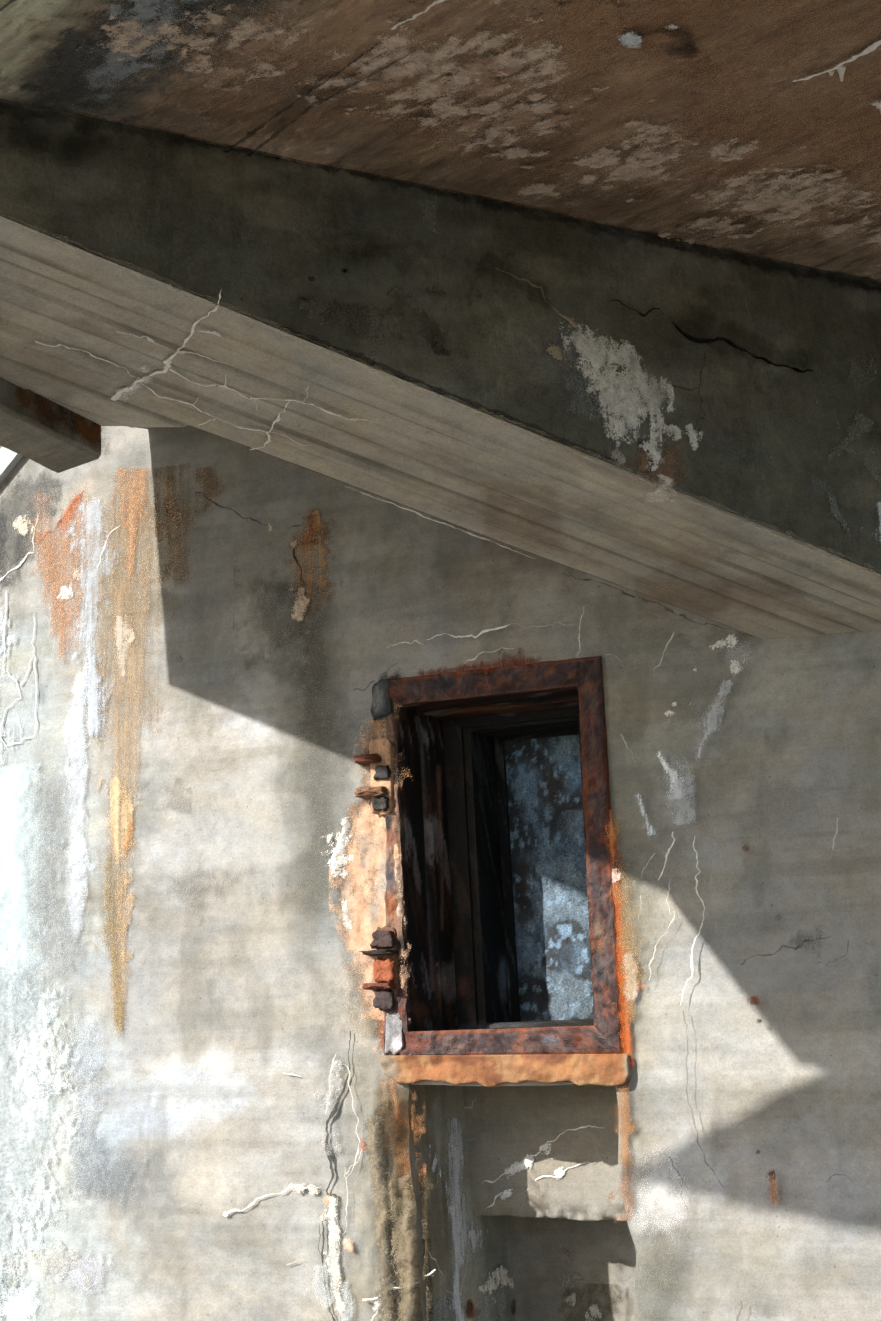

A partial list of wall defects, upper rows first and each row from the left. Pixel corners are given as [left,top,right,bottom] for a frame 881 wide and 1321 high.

leakage [28,0,259,111]
rust [16,388,107,447]
crack [35,289,384,450]
peeling [628,442,686,489]
leakage [0,474,61,655]
rust [57,558,86,599]
rust [95,470,158,1025]
leakage [0,712,51,1024]
crack [222,1031,362,1321]
crack [482,1125,600,1208]
crack [362,1269,436,1321]
spalling [566,1293,602,1321]